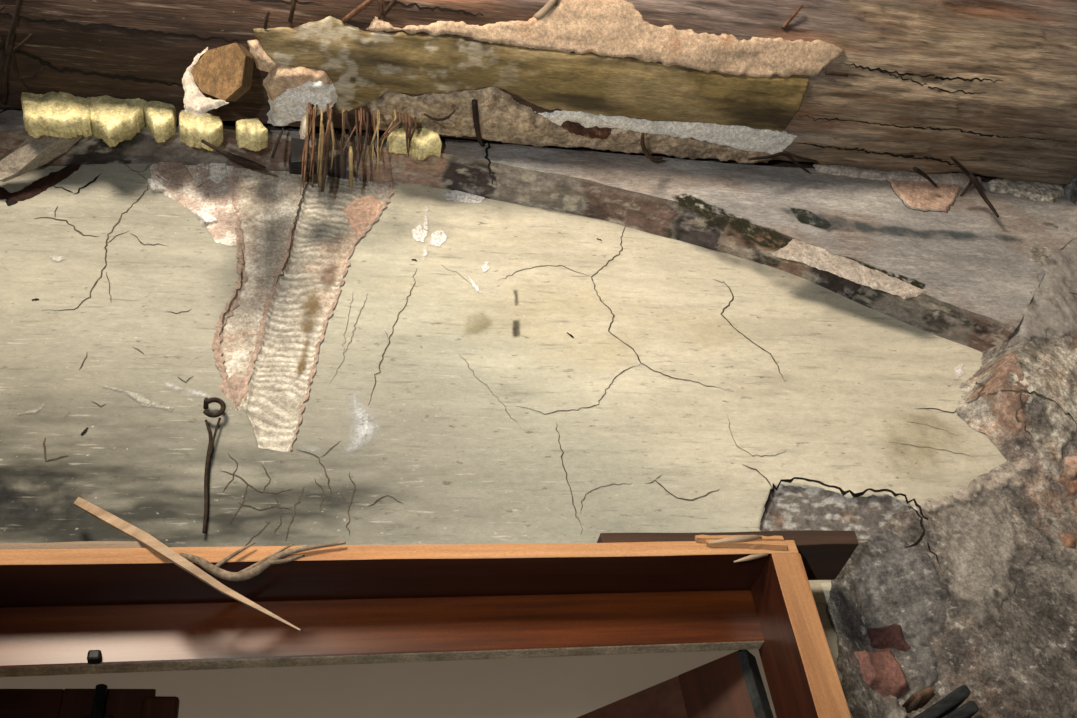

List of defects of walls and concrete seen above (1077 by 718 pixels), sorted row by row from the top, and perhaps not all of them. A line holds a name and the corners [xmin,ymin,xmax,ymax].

crack [839,62,1002,95]
crack [35,164,166,311]
spalling [150,162,396,452]
damp [675,194,792,250]
damp [842,256,925,289]
damp [791,208,978,239]
spalling [888,179,960,211]
crack [463,226,786,535]
crack [223,441,402,546]
damp [350,405,374,449]
spalling [760,205,1077,718]
crack [893,382,1077,457]